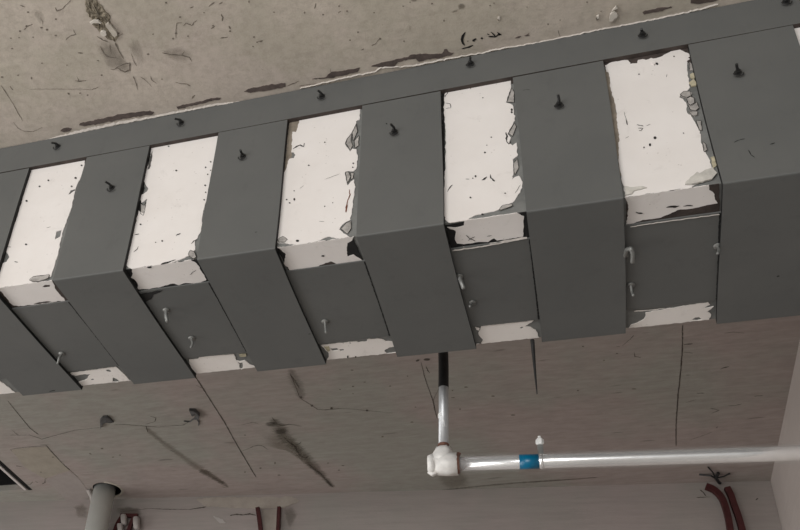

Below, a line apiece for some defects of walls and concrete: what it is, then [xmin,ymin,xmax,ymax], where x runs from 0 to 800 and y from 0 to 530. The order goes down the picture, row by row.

spalling [85,0,138,90]
peeling [0,160,85,306]
peeling [127,136,218,289]
peeling [277,109,361,270]
peeling [444,81,524,244]
peeling [605,50,717,224]
crack [8,401,92,477]
peeling [189,353,255,374]
crack [196,378,267,477]
peeling [321,338,396,360]
peeling [629,302,714,328]
crack [675,325,740,445]